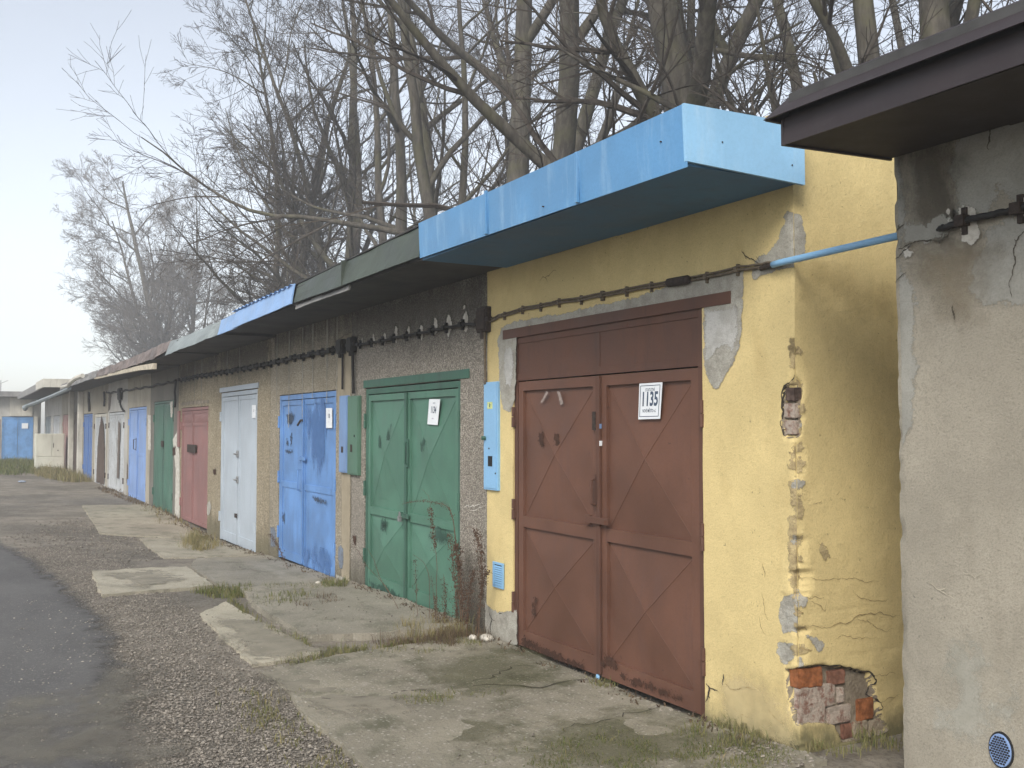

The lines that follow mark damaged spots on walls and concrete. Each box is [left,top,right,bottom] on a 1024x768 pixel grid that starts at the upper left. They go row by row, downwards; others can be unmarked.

spalling [752,211,806,280]
crack [1009,231,1024,296]
spalling [776,338,888,743]
crack [798,544,896,640]